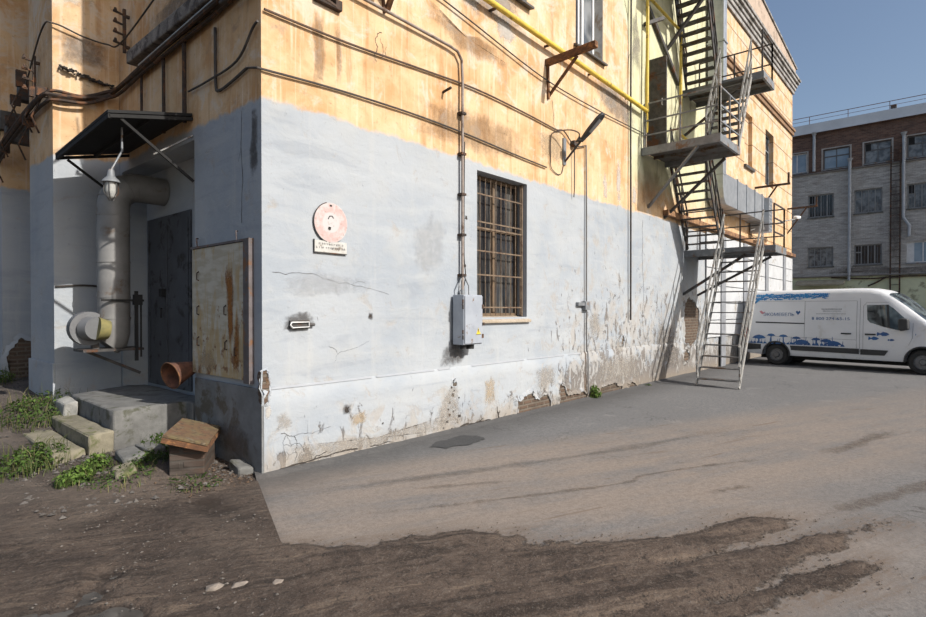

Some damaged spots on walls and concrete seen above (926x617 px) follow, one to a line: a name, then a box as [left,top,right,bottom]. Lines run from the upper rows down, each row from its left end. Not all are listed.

rust [225,271,238,365]
flaking render [681,293,700,366]
spalling [257,368,272,417]
flaking render [513,371,638,414]
crack [280,426,390,469]